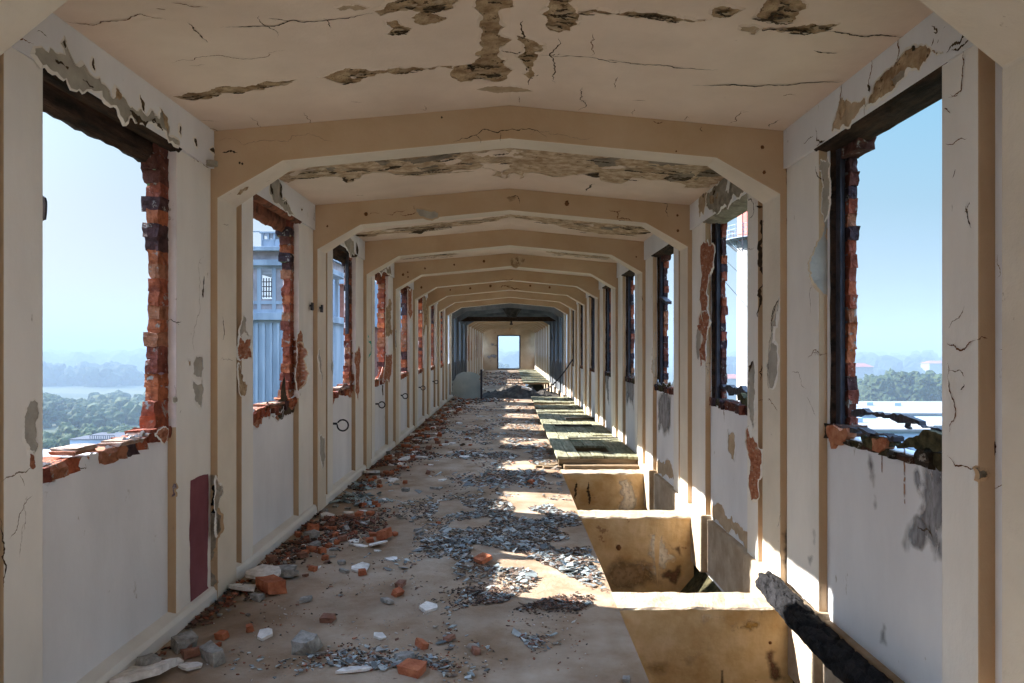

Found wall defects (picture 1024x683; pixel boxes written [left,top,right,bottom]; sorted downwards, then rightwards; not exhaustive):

flaking render [30,35,180,149]
crack [70,3,369,66]
flaking render [169,79,296,101]
flaking render [315,0,841,93]
flaking render [831,43,943,133]
crack [408,128,545,175]
flaking render [807,158,831,297]
flaking render [696,239,716,367]
flaking render [728,297,780,503]
crack [947,311,1002,432]
crack [1,468,30,585]
leakage [908,467,942,556]